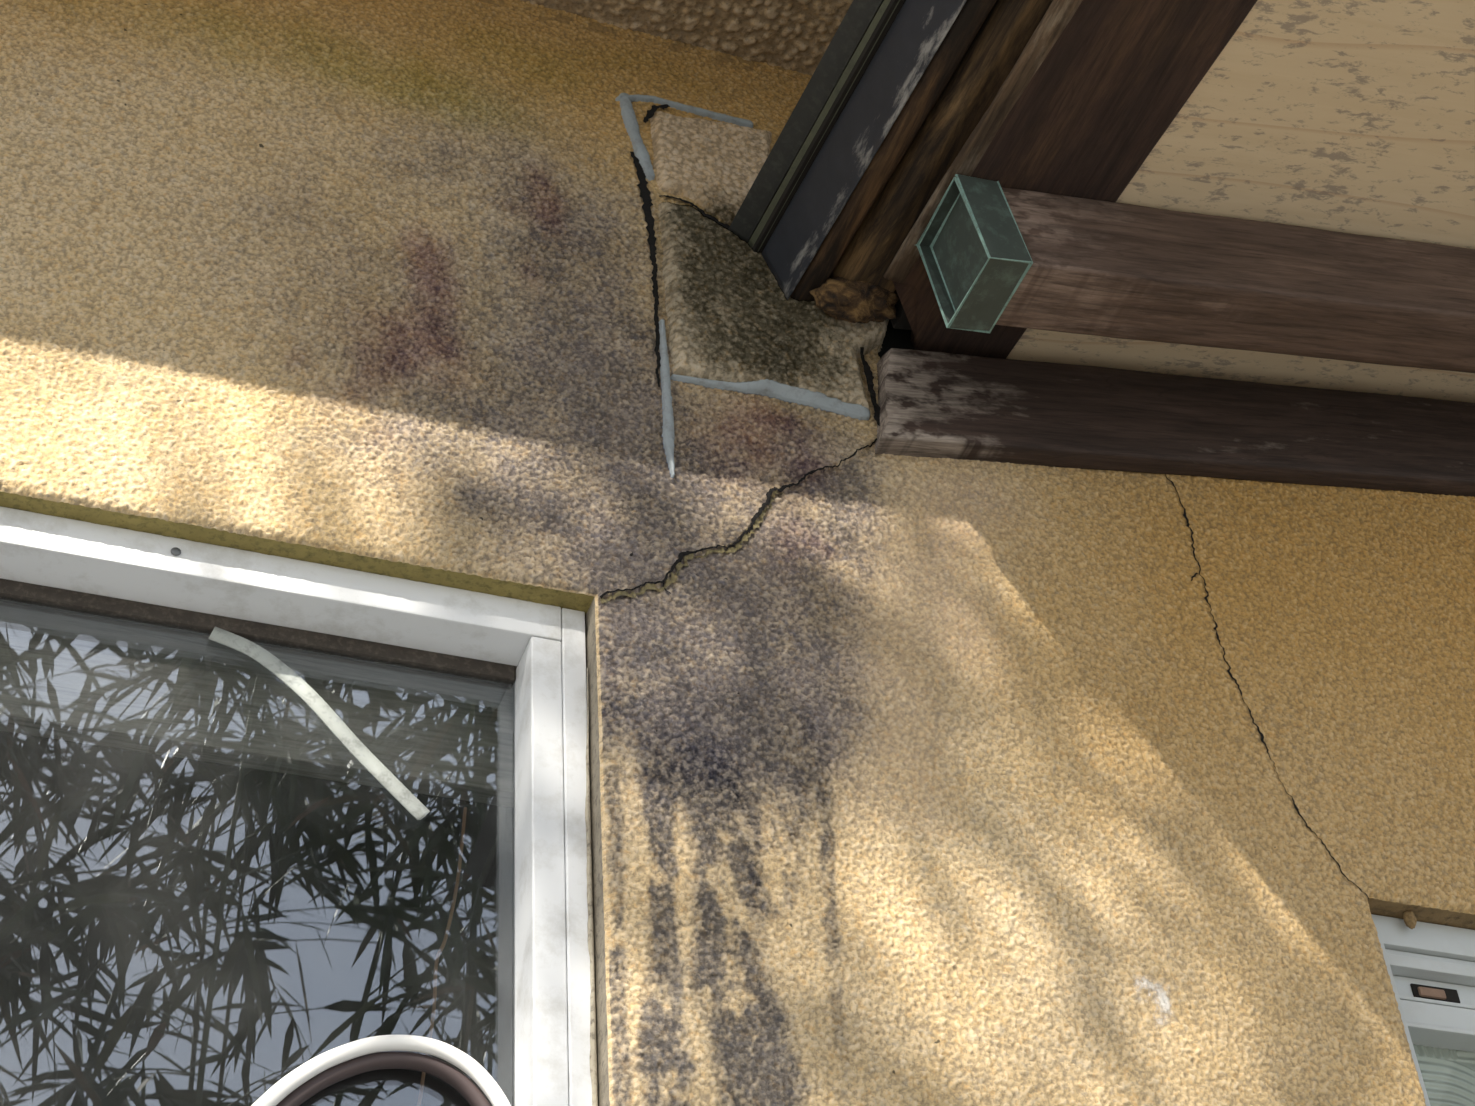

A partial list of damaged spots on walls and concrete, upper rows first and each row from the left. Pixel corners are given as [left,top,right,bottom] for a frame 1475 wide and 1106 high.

crack [630,104,730,387]
crack [600,347,881,603]
crack [1165,474,1369,899]